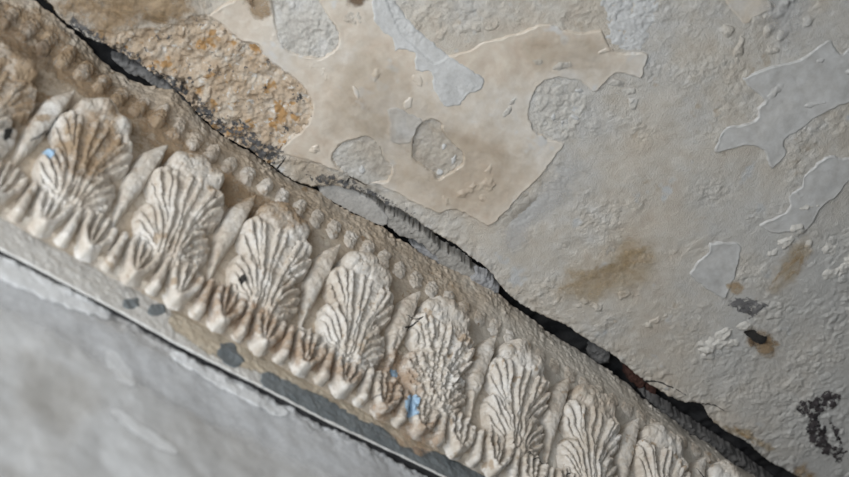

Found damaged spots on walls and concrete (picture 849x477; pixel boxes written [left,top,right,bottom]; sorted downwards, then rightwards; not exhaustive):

crack [30,0,289,178]
peeling [89,0,659,226]
peeling [759,155,849,233]
crack [0,250,441,477]
crack [291,174,800,477]
peeling [689,241,741,298]
water stain [731,297,767,319]
rust [749,332,778,355]
water stain [796,391,848,463]